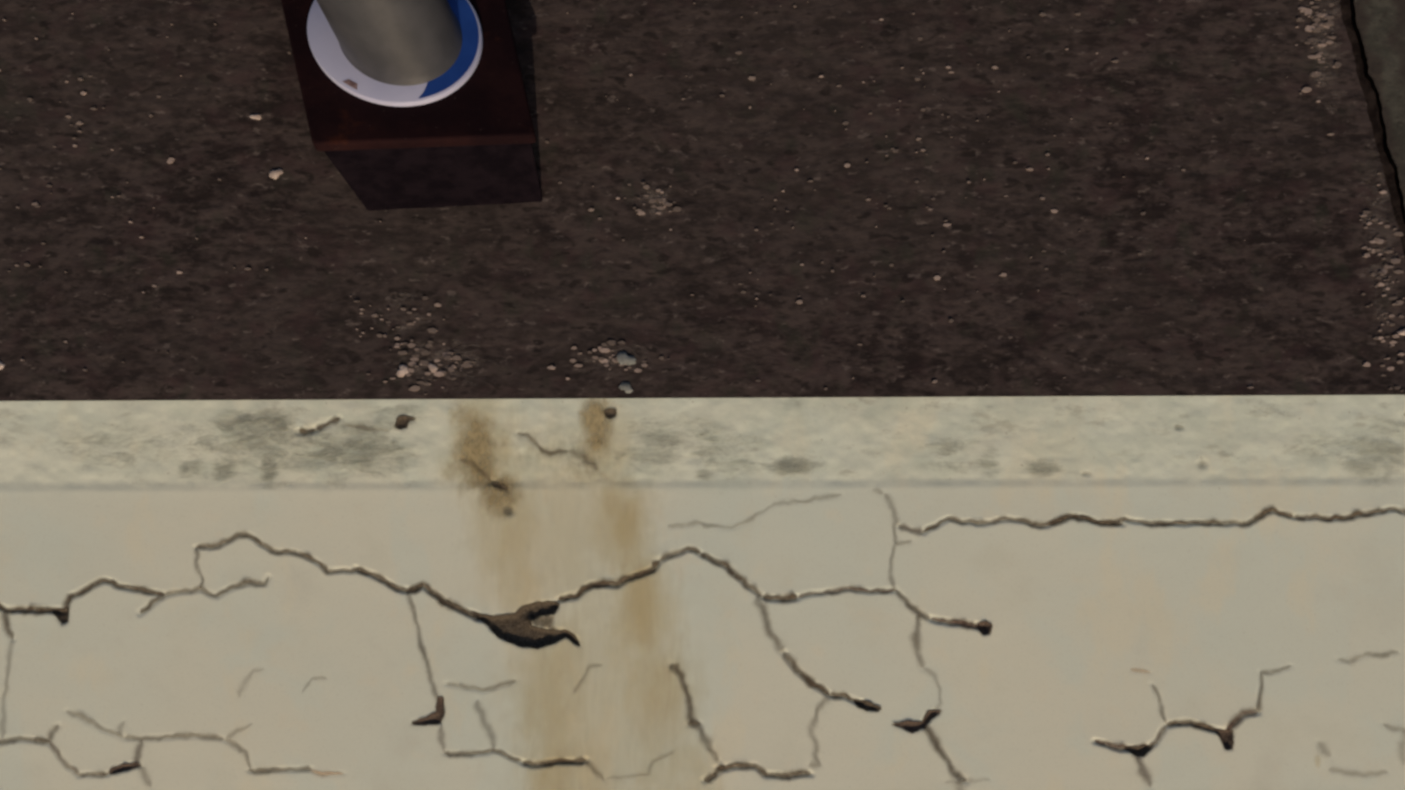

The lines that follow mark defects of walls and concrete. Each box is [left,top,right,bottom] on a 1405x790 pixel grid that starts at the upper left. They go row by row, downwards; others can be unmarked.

rust [461,420,512,507]
crack [900,507,1405,533]
crack [0,533,480,638]
spalling [470,601,580,649]
crack [559,547,978,701]
crack [0,735,221,776]
crack [250,766,340,774]
crack [446,749,586,766]
crack [671,666,702,732]
crack [704,763,810,783]
crack [925,712,965,781]
crack [1095,686,1262,777]